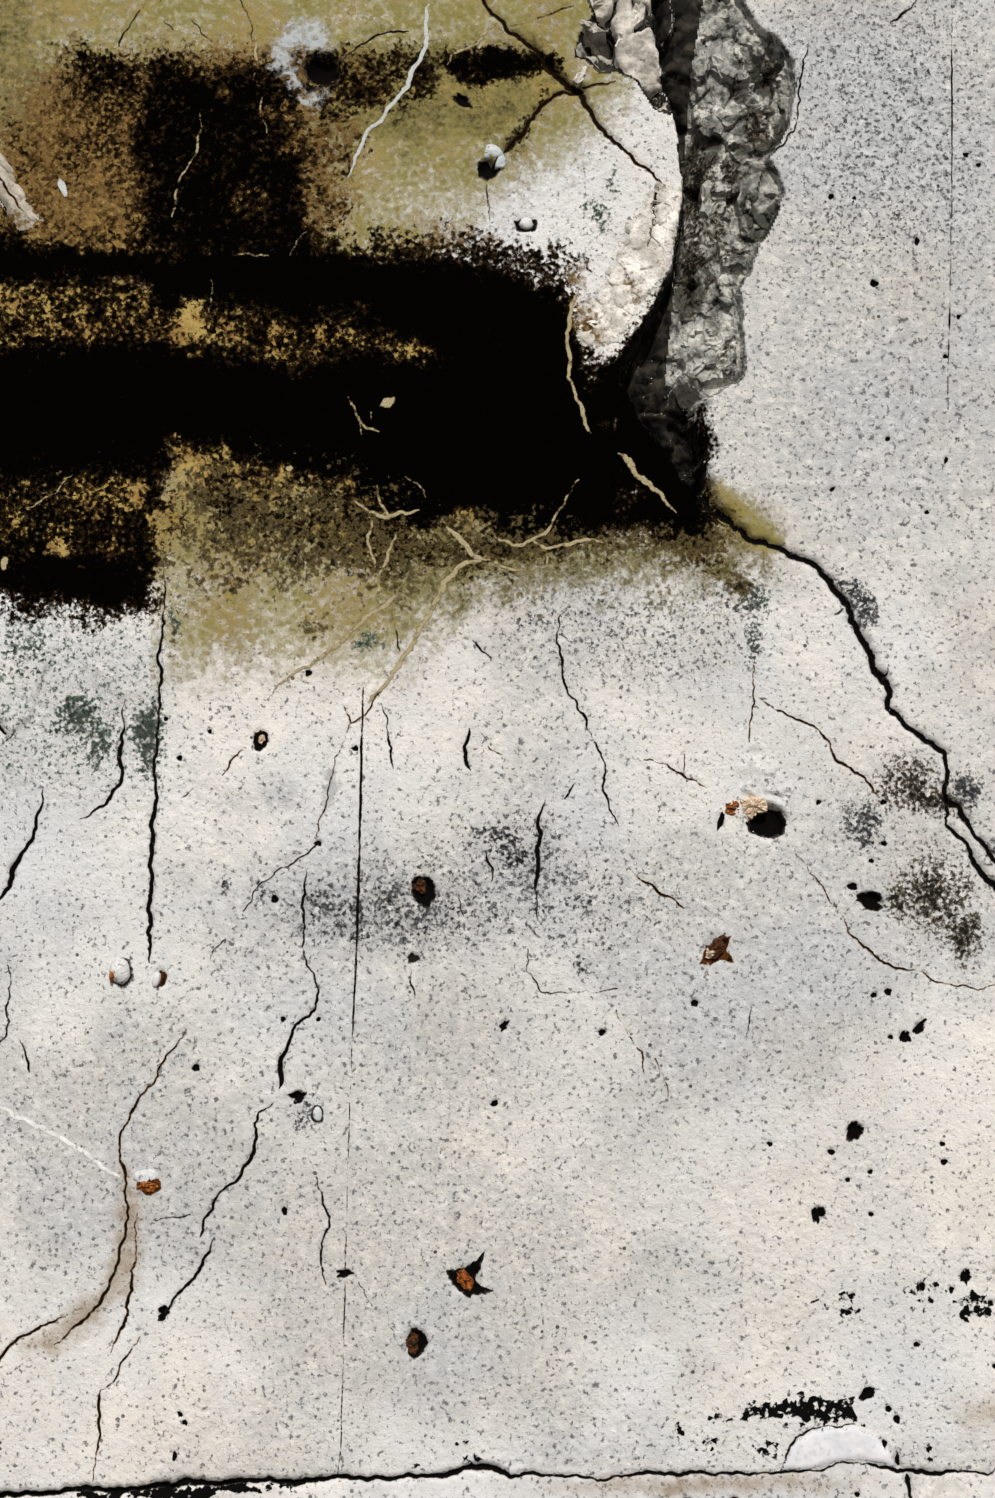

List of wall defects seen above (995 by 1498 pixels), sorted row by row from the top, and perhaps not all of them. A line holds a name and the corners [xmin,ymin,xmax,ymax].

crack [348,396,379,435]
damp [0,0,995,796]
spalling [571,0,797,497]
crack [565,290,995,891]
crack [0,475,995,1498]
corrosion [705,936,725,960]
corrosion [406,1332,419,1355]
corrosion [456,1269,474,1291]